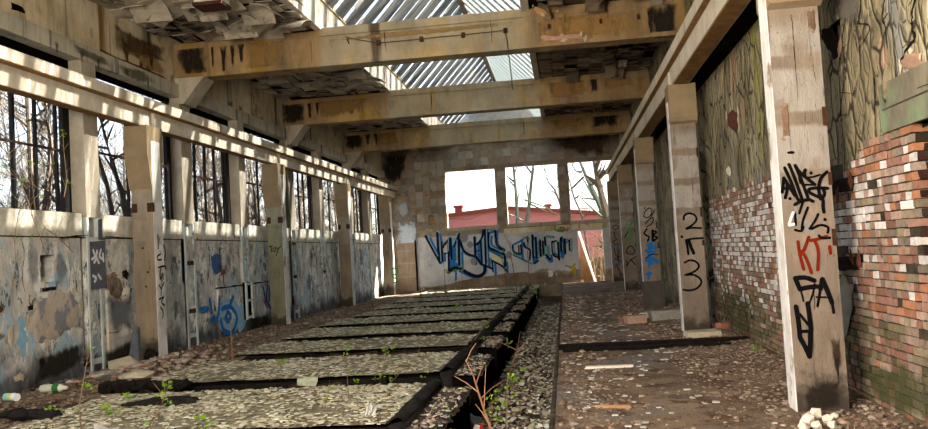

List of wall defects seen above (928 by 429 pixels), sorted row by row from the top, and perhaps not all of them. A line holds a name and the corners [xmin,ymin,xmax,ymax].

spalling [532,4,558,16]
spalling [540,31,587,42]
crack [791,0,916,139]
spalling [898,47,924,73]
spalling [106,269,130,302]
spalling [27,286,83,345]
leakage [807,358,839,409]